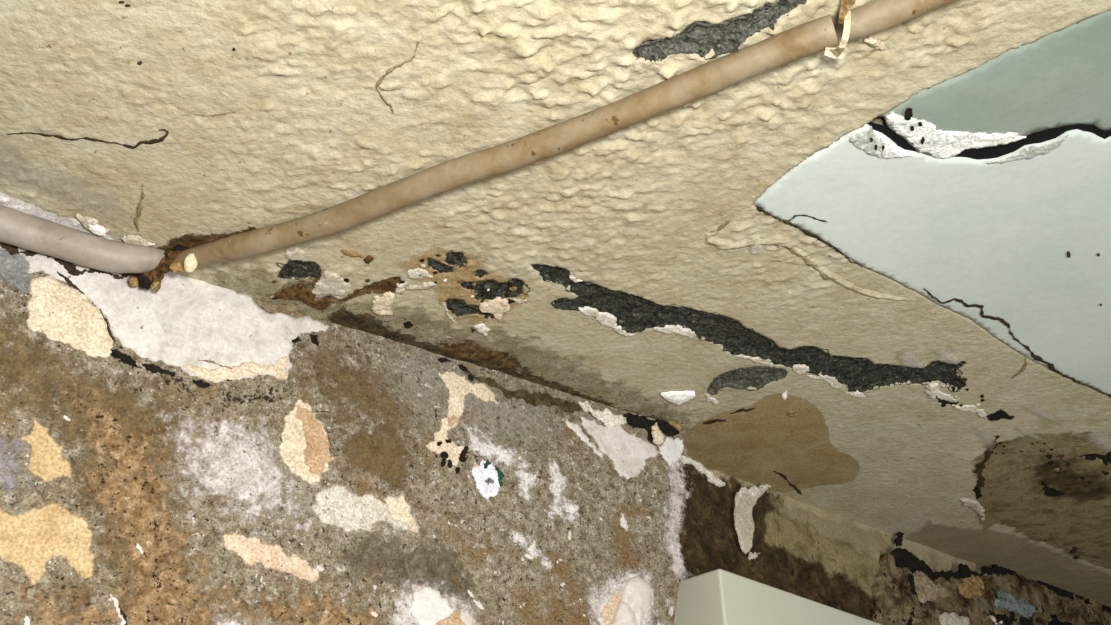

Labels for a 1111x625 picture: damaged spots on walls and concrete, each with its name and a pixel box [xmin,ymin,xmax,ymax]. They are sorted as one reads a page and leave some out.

crack [7,129,169,149]
crack [194,110,237,118]
crack [375,41,419,114]
flaking render [632,0,807,62]
flaking render [0,246,329,388]
flaking render [531,264,1014,421]
crack [924,288,1111,397]
water stain [289,309,880,625]
flaking render [566,400,771,561]
spalling [869,432,1111,625]
water stain [985,509,1111,561]
water stain [1036,459,1111,500]